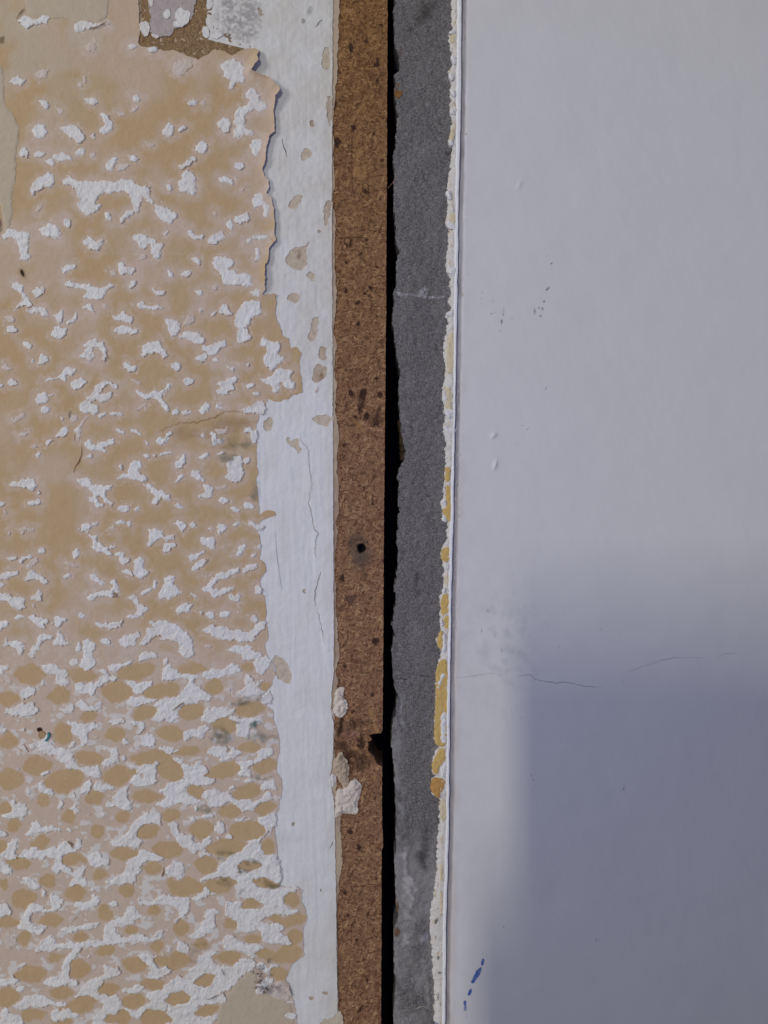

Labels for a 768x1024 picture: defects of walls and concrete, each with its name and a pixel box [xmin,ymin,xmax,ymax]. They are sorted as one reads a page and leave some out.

peeling [18,15,49,29]
peeling [73,21,109,53]
peeling [9,69,49,87]
peeling [217,58,267,156]
peeling [288,195,303,210]
peeling [2,75,295,444]
peeling [285,242,315,281]
peeling [0,338,301,1024]